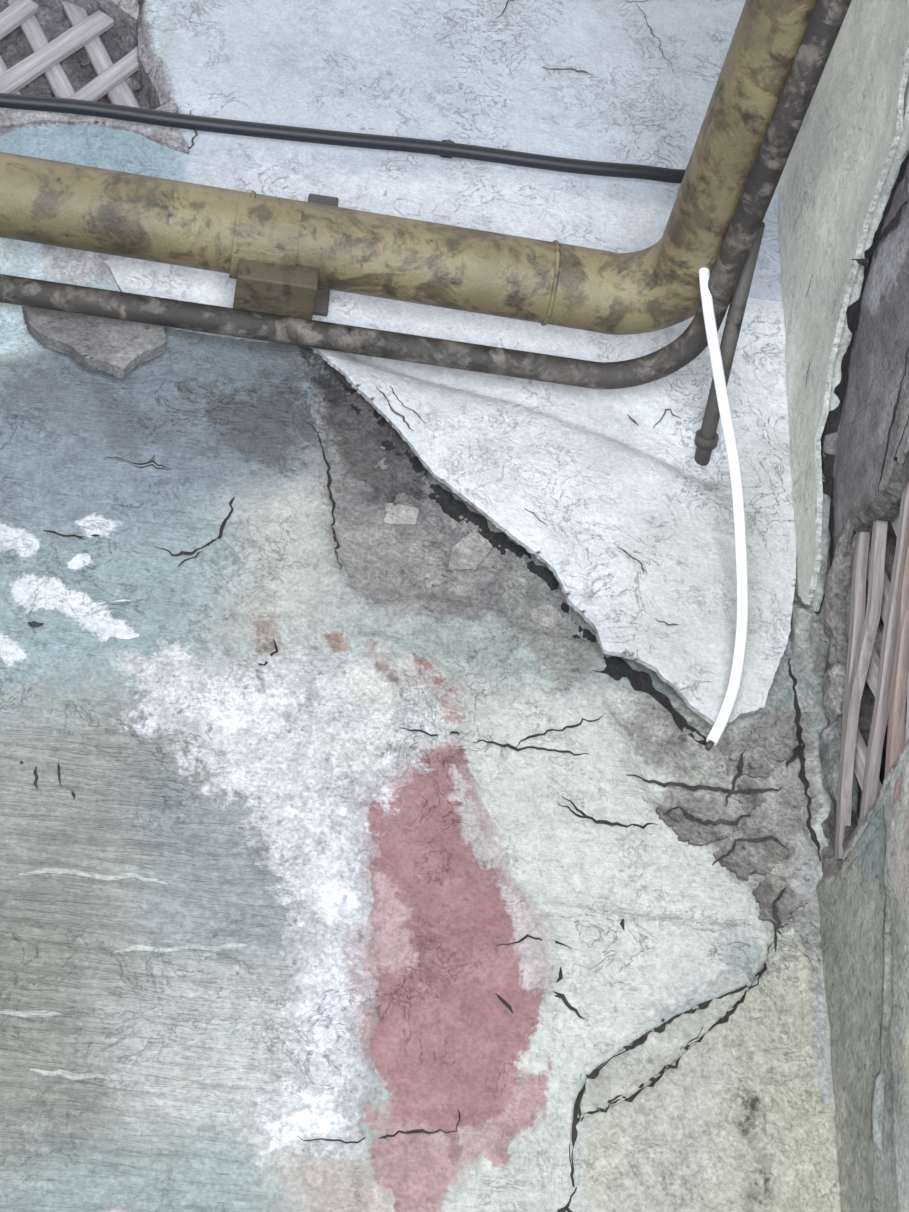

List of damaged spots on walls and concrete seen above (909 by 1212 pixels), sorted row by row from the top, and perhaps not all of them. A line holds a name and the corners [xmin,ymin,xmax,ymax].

spalling [0,0,189,154]
peeling [590,0,909,963]
crack [878,346,909,492]
peeling [0,344,618,1212]
crack [557,796,658,829]
crack [786,658,821,861]
crack [496,934,584,1019]
crack [557,887,786,1212]